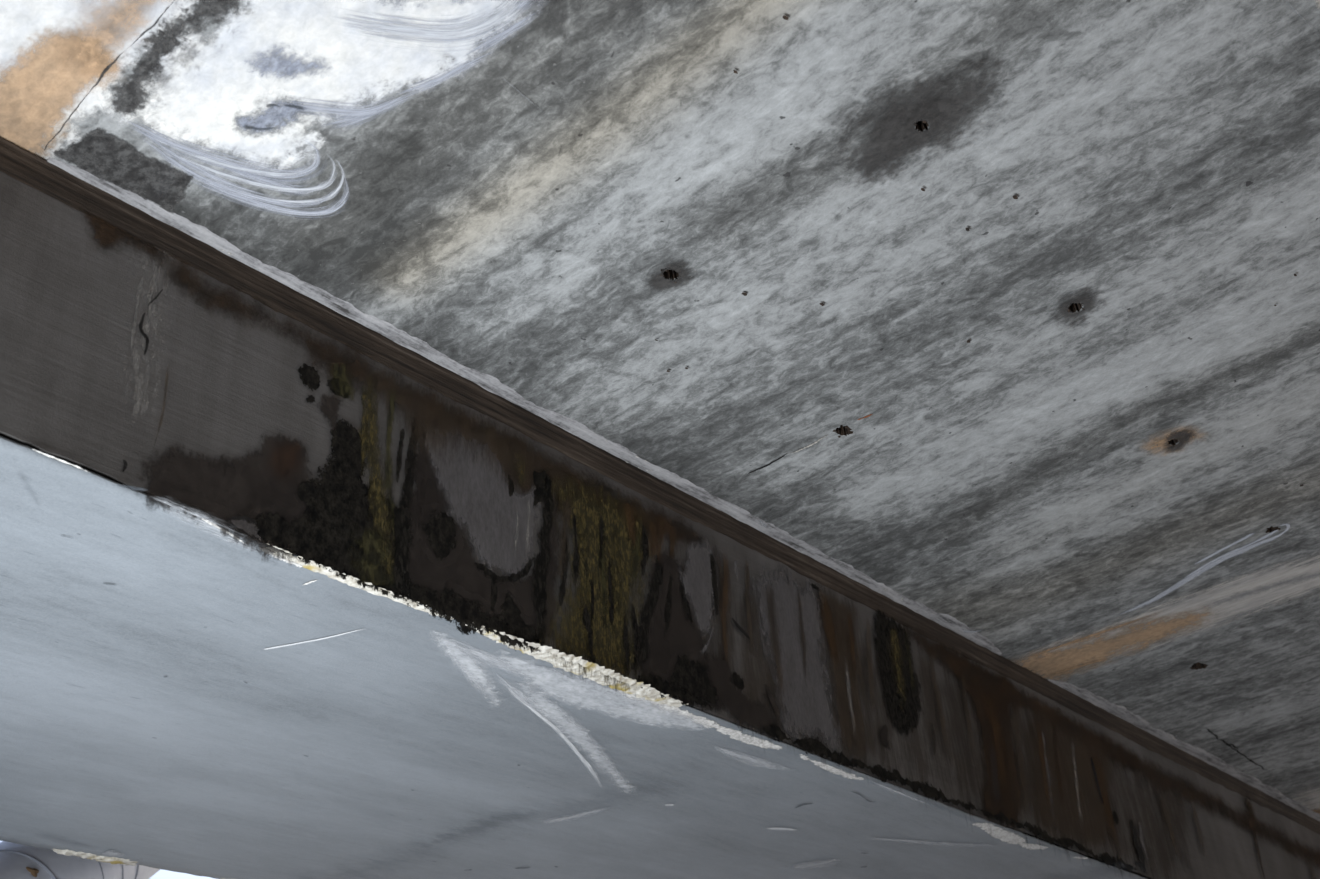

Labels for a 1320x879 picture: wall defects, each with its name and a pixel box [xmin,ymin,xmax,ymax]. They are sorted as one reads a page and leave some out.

water stain [839,61,1000,184]
crack [139,289,163,353]
water stain [141,434,312,563]
water stain [352,393,649,673]
rust [1149,430,1195,452]